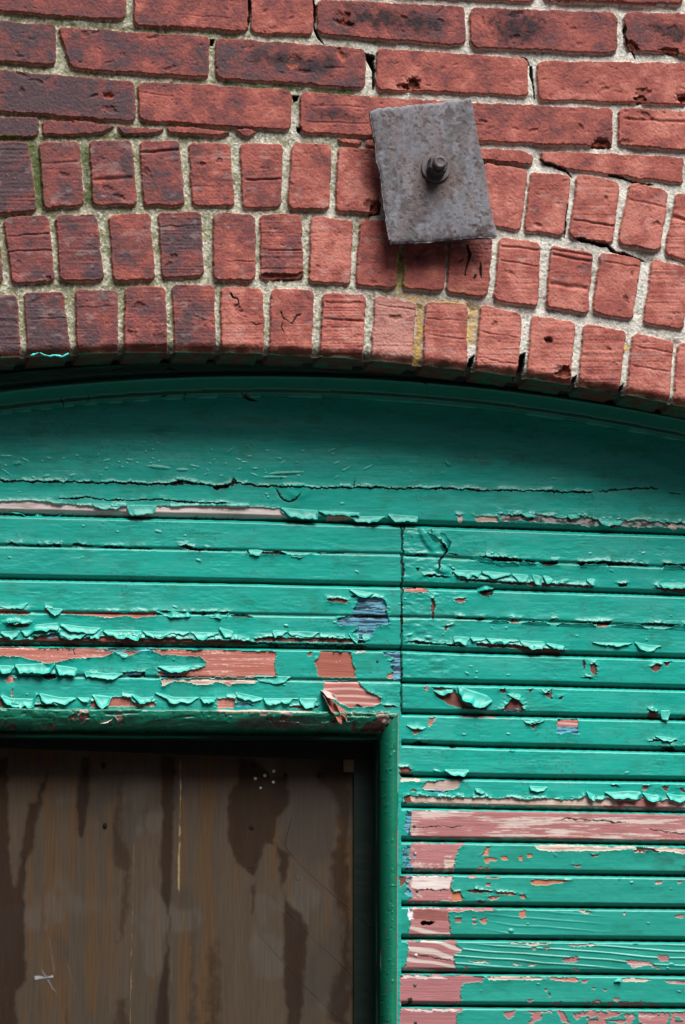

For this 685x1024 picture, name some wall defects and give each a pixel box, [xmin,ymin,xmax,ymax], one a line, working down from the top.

crack [539,159,572,178]
crack [608,173,654,186]
crack [230,292,301,333]
peeling [0,500,418,524]
crack [0,478,681,504]
peeling [457,513,685,531]
peeling [453,555,648,597]
peeling [0,589,396,724]
peeling [383,616,685,680]
leakage [228,760,288,879]
peeling [399,766,685,1024]
leakage [285,902,307,1024]